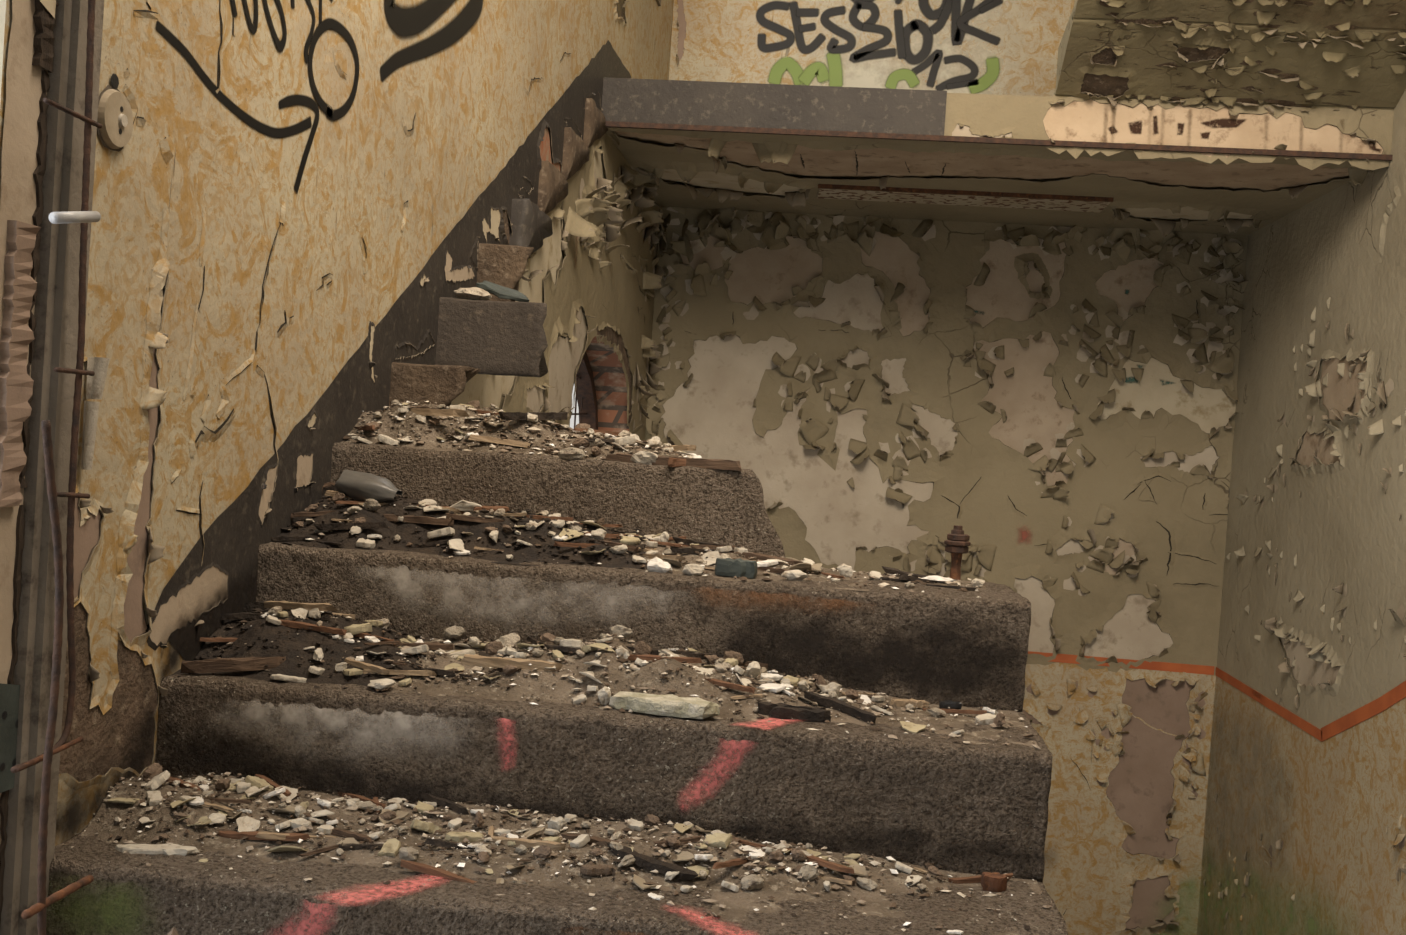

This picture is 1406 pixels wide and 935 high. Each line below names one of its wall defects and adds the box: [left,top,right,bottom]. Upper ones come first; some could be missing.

spalling [0,0,229,790]
peeling [257,462,278,528]
peeling [419,205,513,289]
peeling [451,0,1406,935]